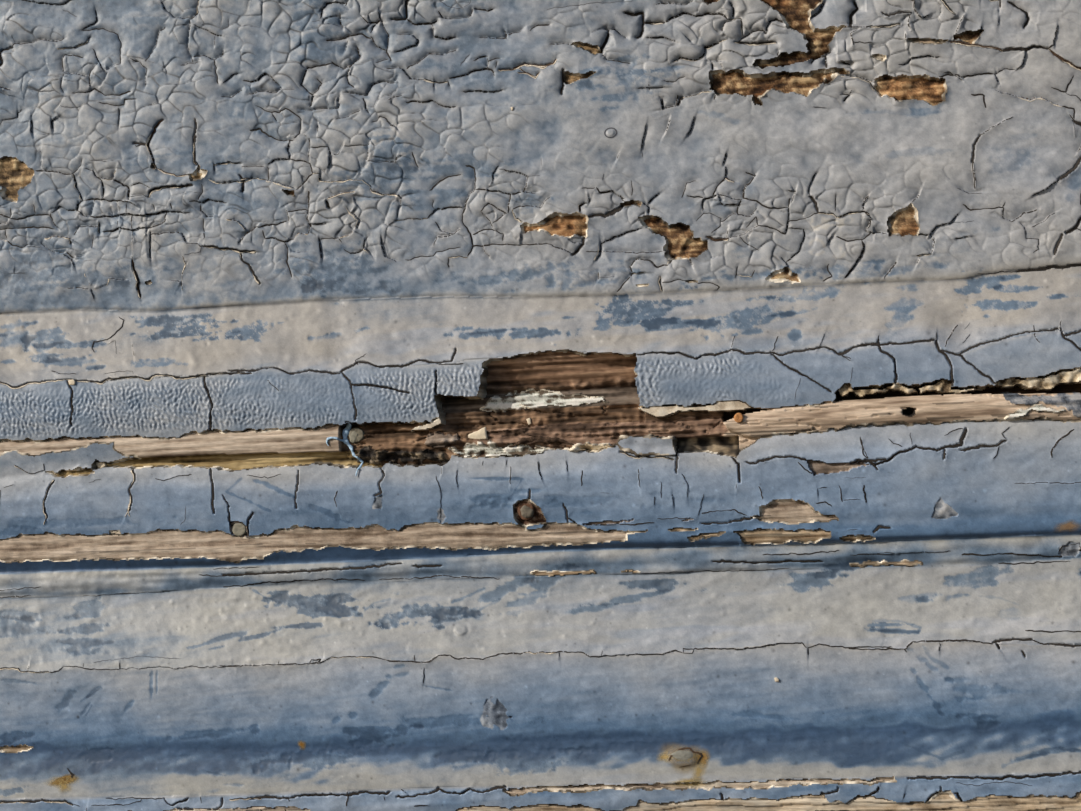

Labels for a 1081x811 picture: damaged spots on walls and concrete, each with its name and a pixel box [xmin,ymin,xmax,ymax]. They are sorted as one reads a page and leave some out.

peeling [709,0,850,106]
peeling [870,53,947,106]
crack [0,0,919,299]
crack [811,0,1081,279]
peeling [520,212,589,238]
peeling [620,200,708,260]
crack [0,317,463,431]
crack [634,322,1081,397]
peeling [0,349,1081,478]
peeling [0,499,648,563]
crack [0,630,1081,683]
peeling [455,776,1081,811]